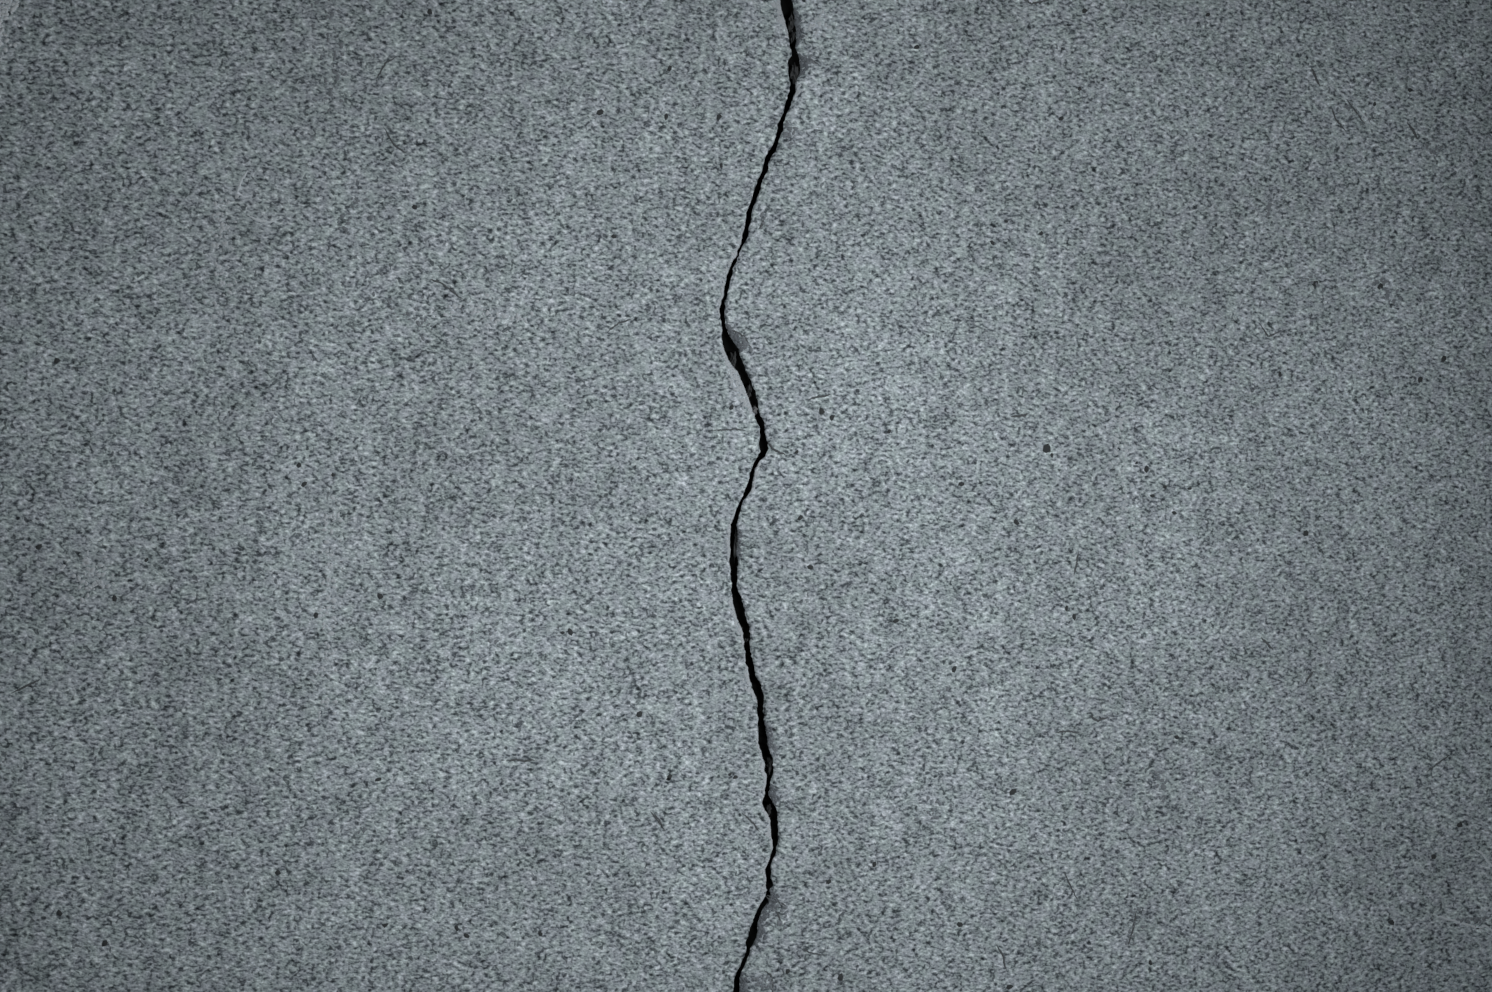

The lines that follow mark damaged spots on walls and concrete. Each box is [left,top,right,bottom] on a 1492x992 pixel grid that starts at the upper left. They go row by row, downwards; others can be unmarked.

crack [711,0,822,992]